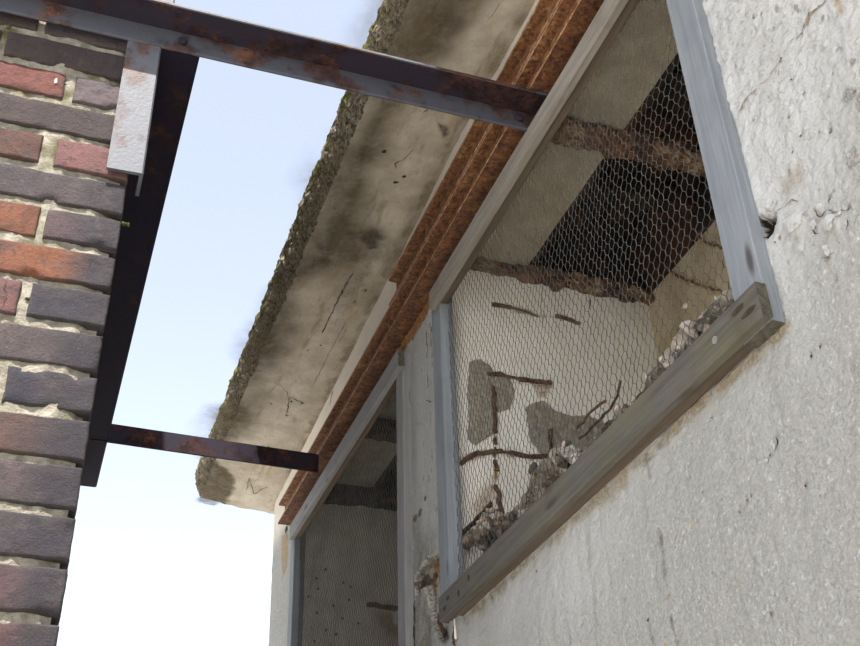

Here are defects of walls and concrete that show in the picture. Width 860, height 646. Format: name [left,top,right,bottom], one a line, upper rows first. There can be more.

damp [380,0,471,61]
crack [738,1,825,111]
damp [295,100,398,278]
hole [759,207,782,243]
rust [470,256,655,306]
rust [399,299,432,350]
rust [491,302,538,318]
damp [212,406,251,436]
flaking render [467,359,515,445]
flaking render [526,401,605,454]
damp [199,462,233,505]
spalling [413,556,448,646]